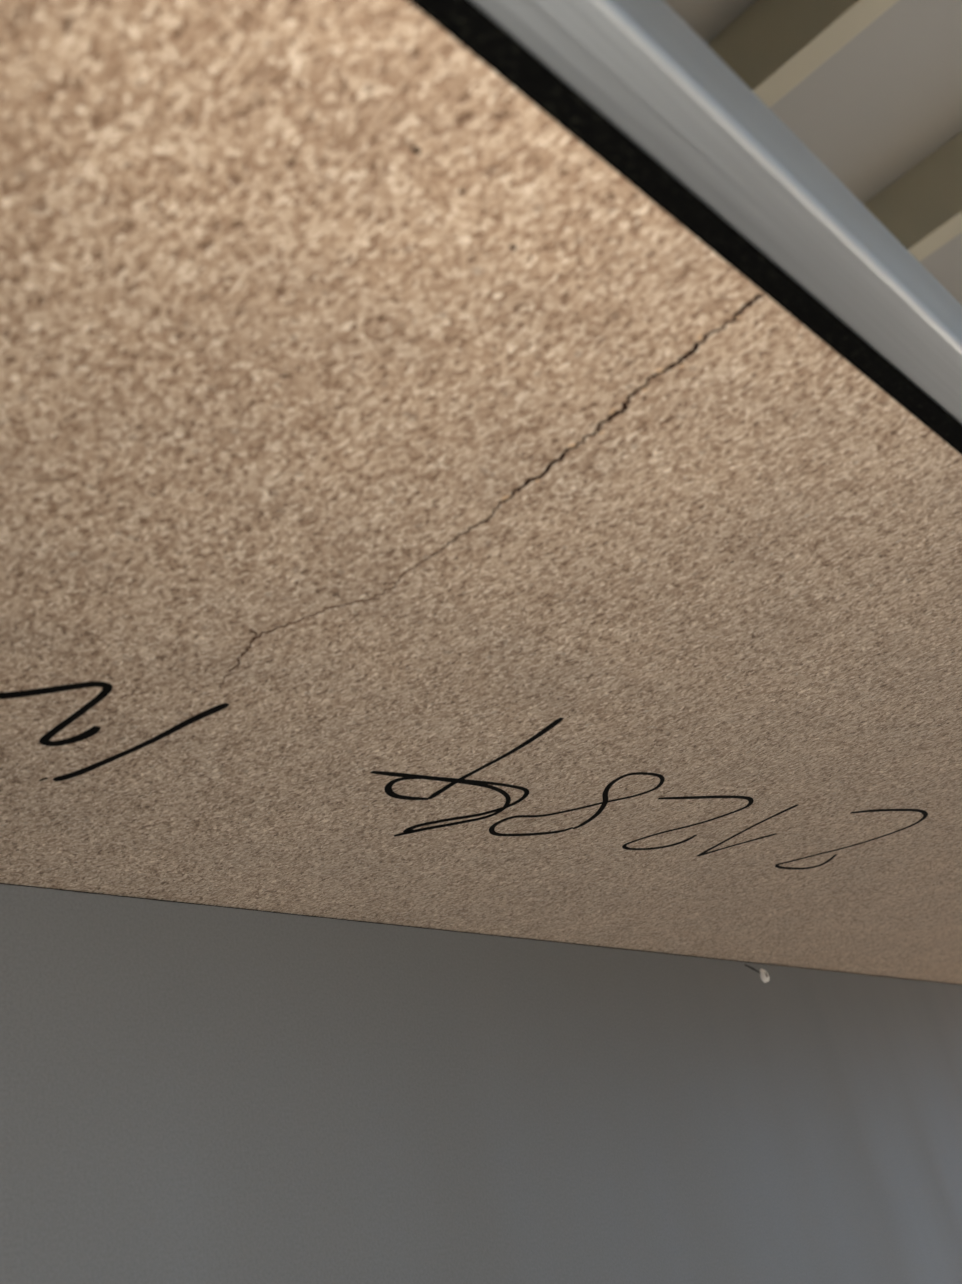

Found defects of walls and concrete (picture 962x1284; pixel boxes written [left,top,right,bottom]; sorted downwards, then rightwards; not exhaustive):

crack [222,294,763,684]